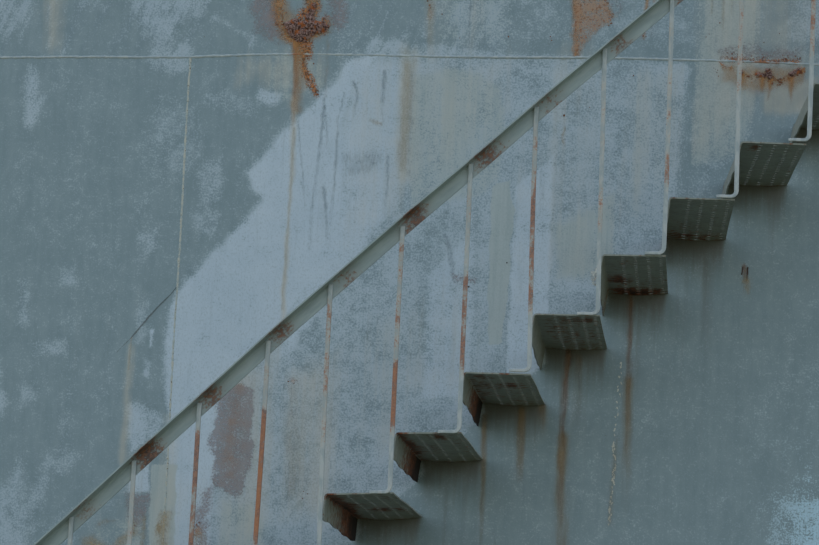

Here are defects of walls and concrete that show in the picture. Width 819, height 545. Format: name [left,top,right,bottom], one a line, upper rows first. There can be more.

rust [252,0,345,96]
rust [573,0,614,56]
rust [715,42,805,86]